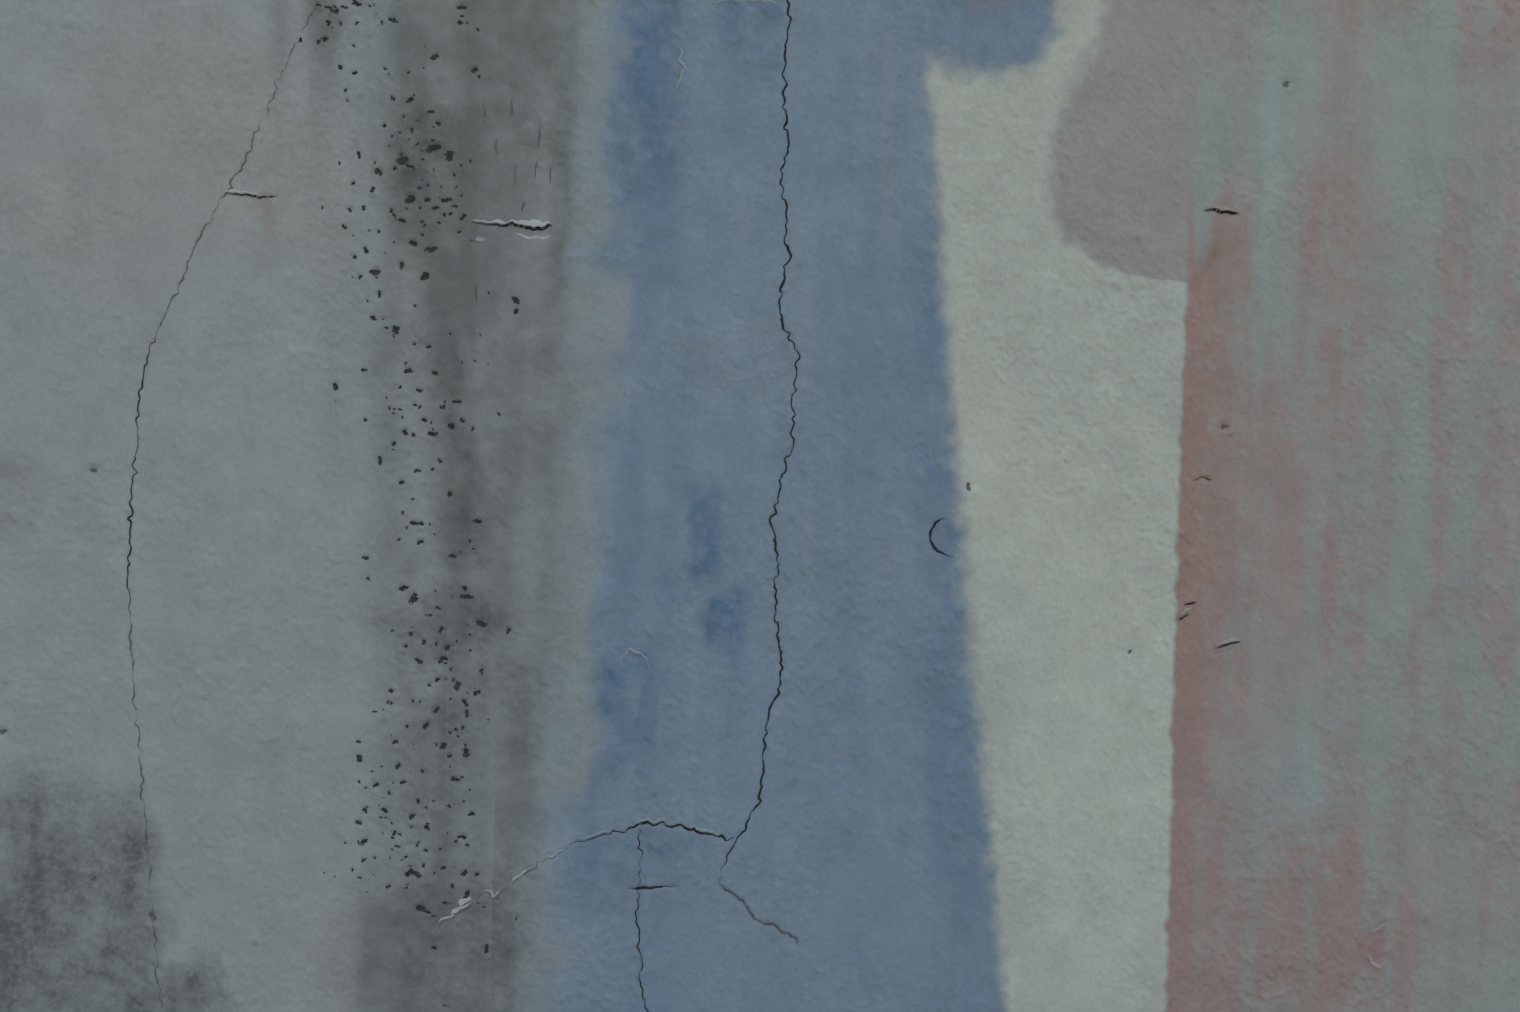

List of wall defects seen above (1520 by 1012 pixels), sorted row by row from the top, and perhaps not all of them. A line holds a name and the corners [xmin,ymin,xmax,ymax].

leakage [299,0,378,67]
hole [299,0,398,44]
leakage [372,0,572,265]
flaking render [342,94,553,465]
crack [126,0,317,1010]
flaking render [397,459,442,545]
crack [429,0,800,1012]
flaking render [929,518,962,557]
leakage [354,332,555,1012]